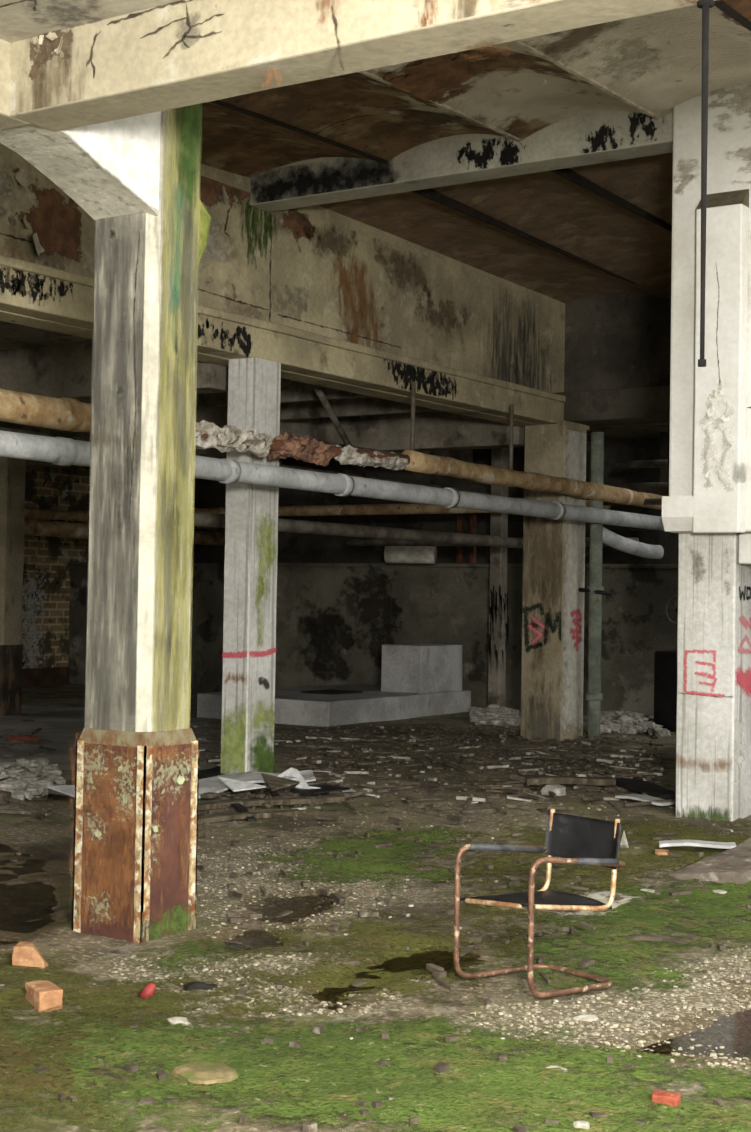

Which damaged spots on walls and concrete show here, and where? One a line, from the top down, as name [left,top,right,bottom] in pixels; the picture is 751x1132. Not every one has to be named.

crack [86,0,223,78]
peeling [720,0,751,27]
peeling [372,50,497,129]
flaking render [13,168,82,262]
leakage [246,205,270,262]
leakage [162,158,194,732]
peeling [699,382,735,492]
rust [77,742,139,926]